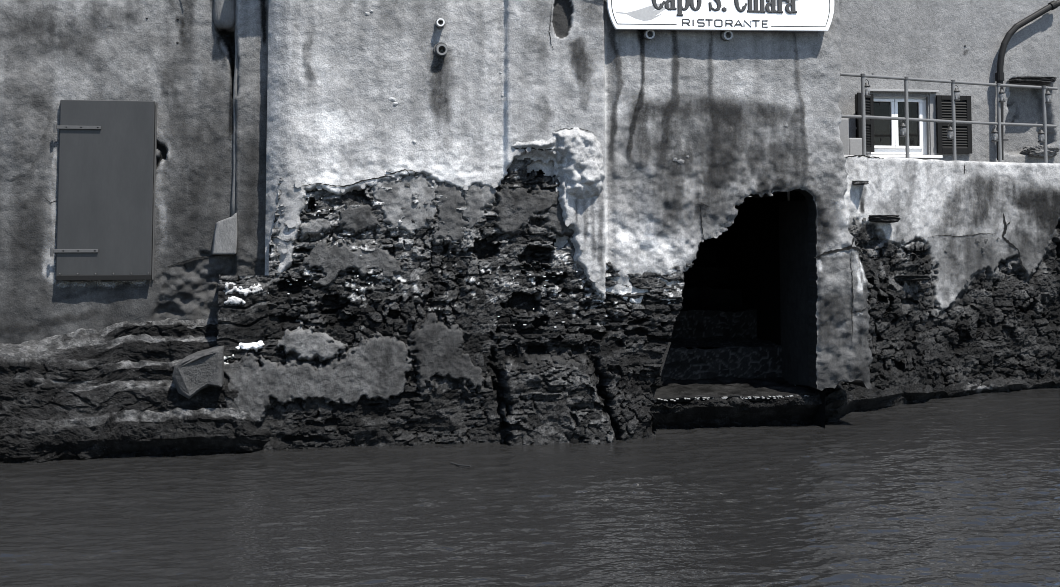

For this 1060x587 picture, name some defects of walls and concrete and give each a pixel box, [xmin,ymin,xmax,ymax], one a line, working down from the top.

damp [433,53,449,116]
damp [570,39,588,81]
damp [610,30,623,152]
damp [627,30,783,221]
spalling [220,147,694,422]
spalling [850,217,1060,362]
crack [932,213,1027,274]